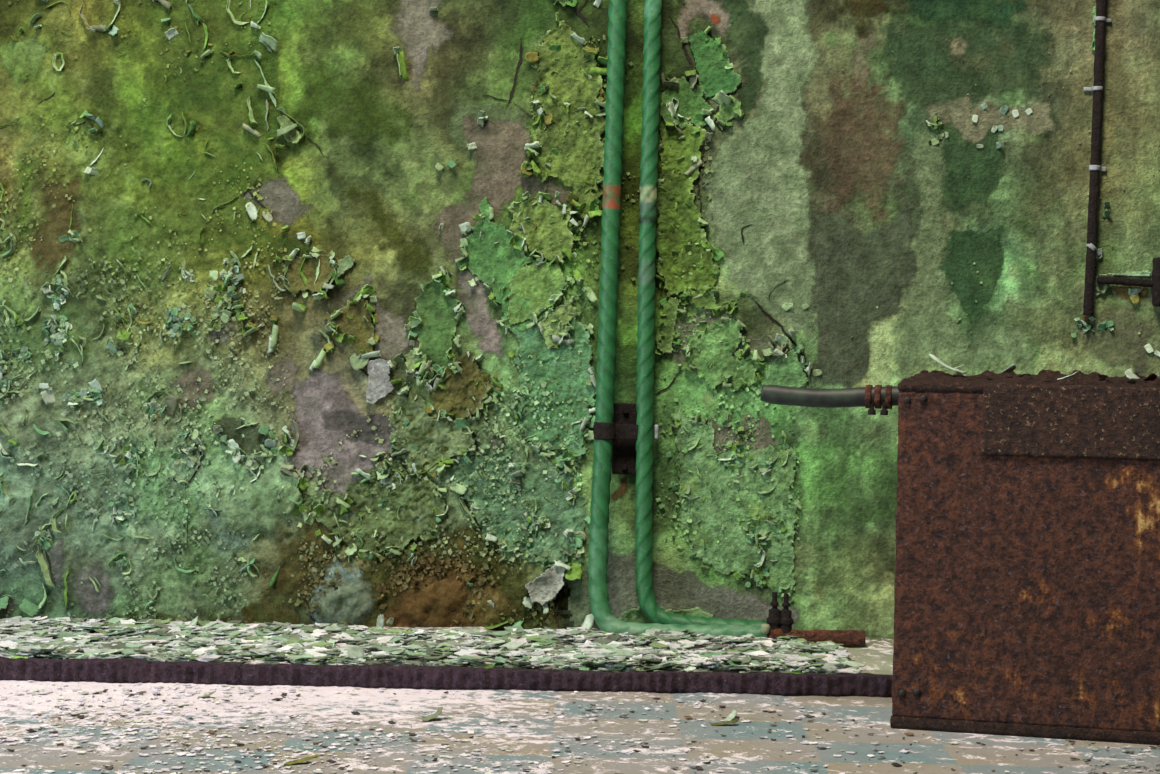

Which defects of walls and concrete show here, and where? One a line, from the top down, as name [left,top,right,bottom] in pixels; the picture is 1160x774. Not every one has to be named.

peeling [0,0,608,619]
peeling [652,0,823,630]
peeling [376,614,394,631]
peeling [581,614,595,632]
spalling [607,553,652,624]